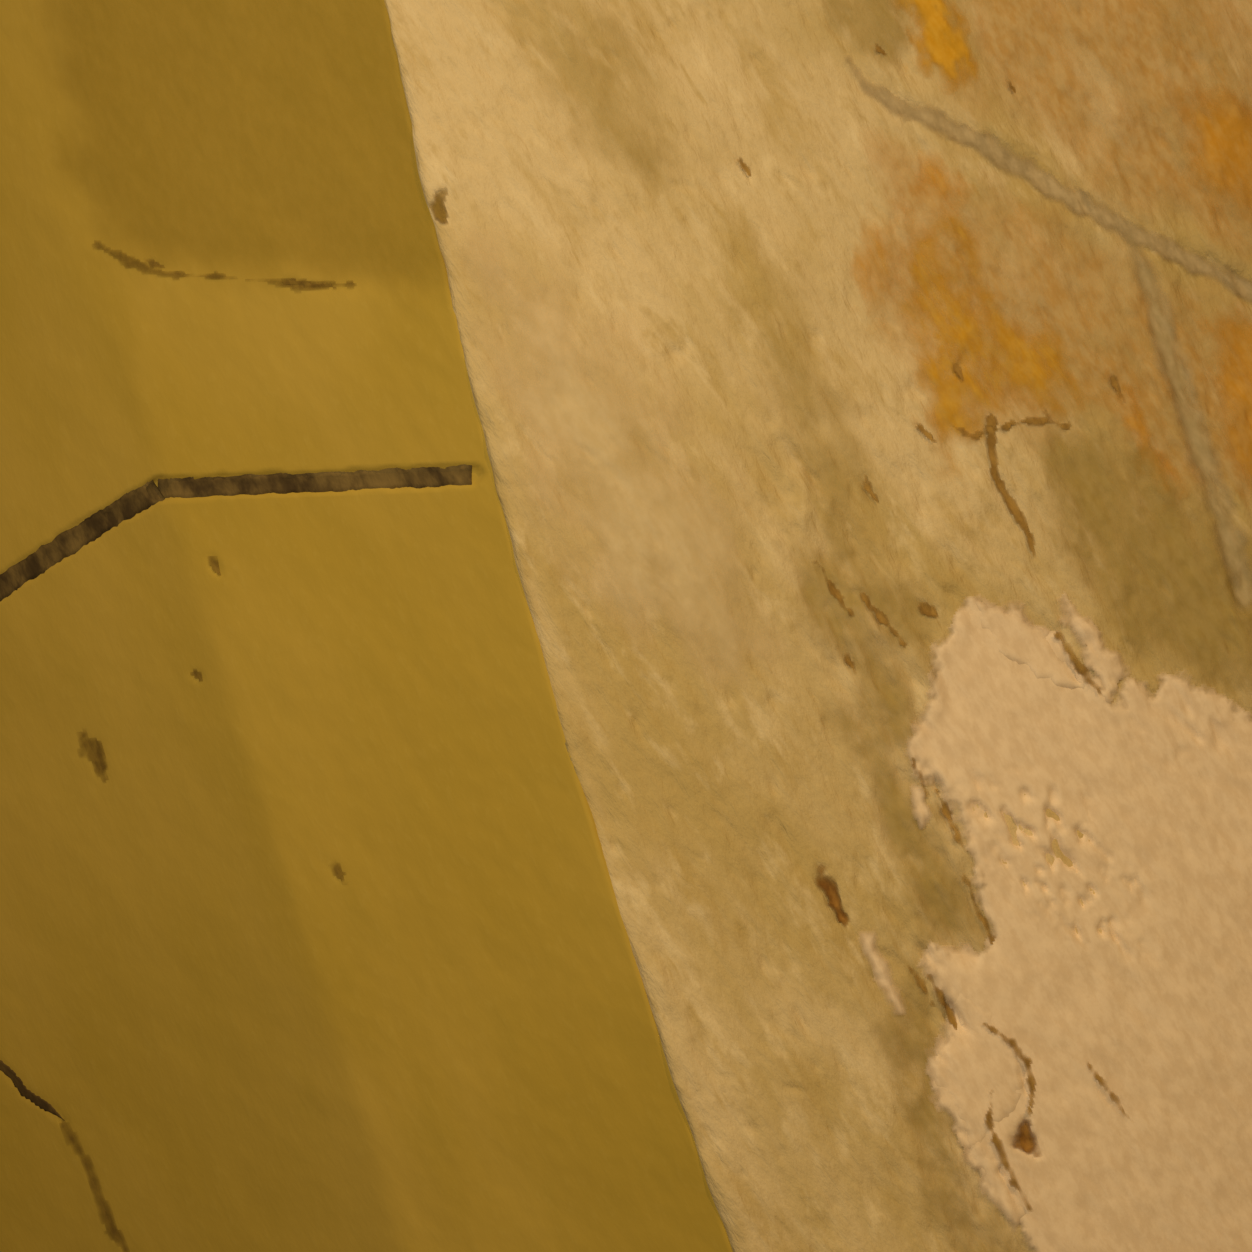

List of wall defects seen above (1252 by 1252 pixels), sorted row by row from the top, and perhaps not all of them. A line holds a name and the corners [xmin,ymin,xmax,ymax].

corrosion [897,0,974,79]
flaking render [861,933,904,1013]
flaking render [908,594,1252,1252]
crack [0,1060,126,1251]